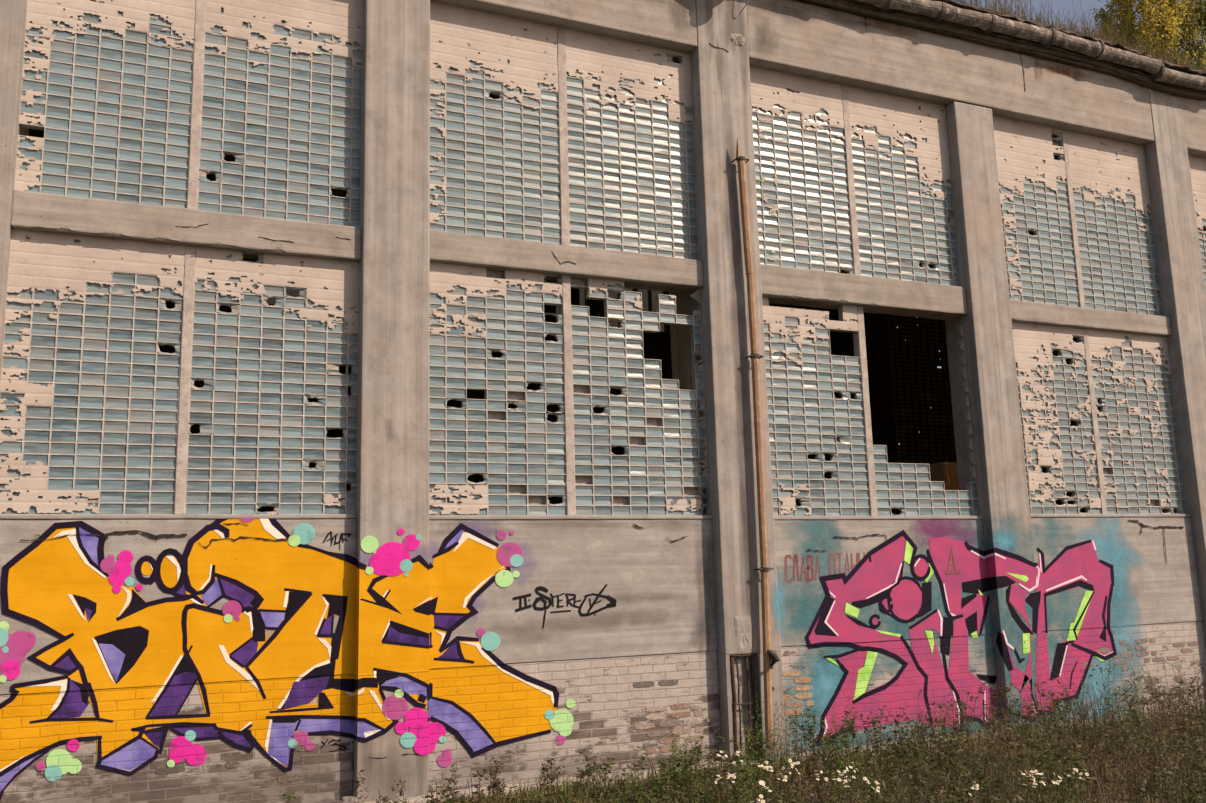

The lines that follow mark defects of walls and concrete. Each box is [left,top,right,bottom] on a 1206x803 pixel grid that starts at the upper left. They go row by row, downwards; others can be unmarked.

peeling [14,0,363,191]
peeling [430,1,693,138]
peeling [749,66,952,200]
peeling [992,115,1152,301]
peeling [1188,155,1206,252]
peeling [0,226,360,514]
peeling [430,262,562,338]
peeling [762,296,858,365]
peeling [1012,322,1171,508]
peeling [429,484,489,515]
peeling [666,499,702,511]
peeling [779,483,812,515]